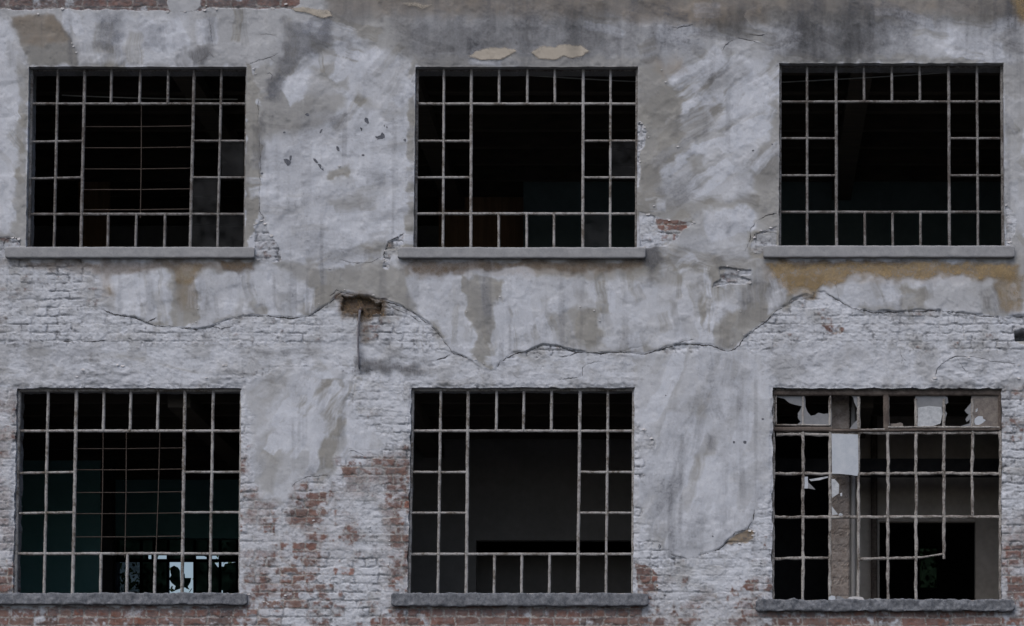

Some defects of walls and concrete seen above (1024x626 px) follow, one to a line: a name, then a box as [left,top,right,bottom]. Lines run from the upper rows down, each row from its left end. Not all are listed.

peeling [470,47,516,60]
peeling [532,44,588,60]
peeling [637,67,696,248]
peeling [172,270,200,327]
crack [106,289,466,360]
peeling [306,235,408,318]
crack [498,286,1022,380]
peeling [821,322,844,335]
peeling [0,456,410,626]
spalling [726,530,755,545]